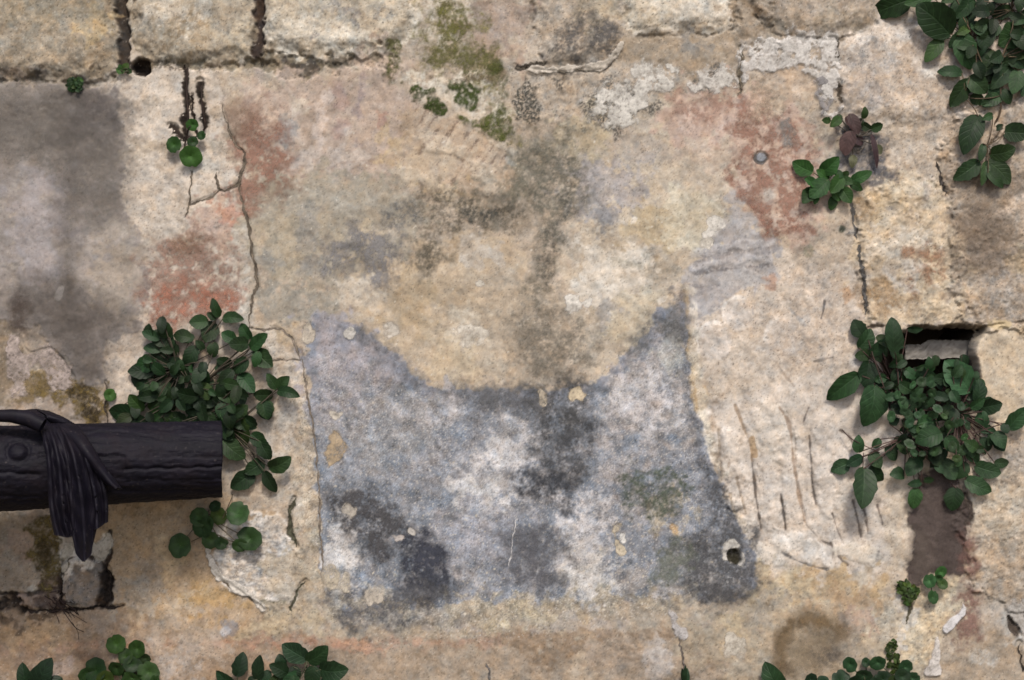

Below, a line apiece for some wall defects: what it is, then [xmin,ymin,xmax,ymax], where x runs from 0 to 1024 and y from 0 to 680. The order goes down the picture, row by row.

leakage [65,85,120,211]
leakage [415,143,576,273]
leakage [12,289,120,379]
crack [168,65,324,611]
leakage [474,318,594,515]
spalling [92,533,113,563]
peeling [205,548,265,612]
leakage [326,491,450,633]
leakage [501,523,563,591]
leakage [649,471,761,603]
leakage [907,469,974,586]